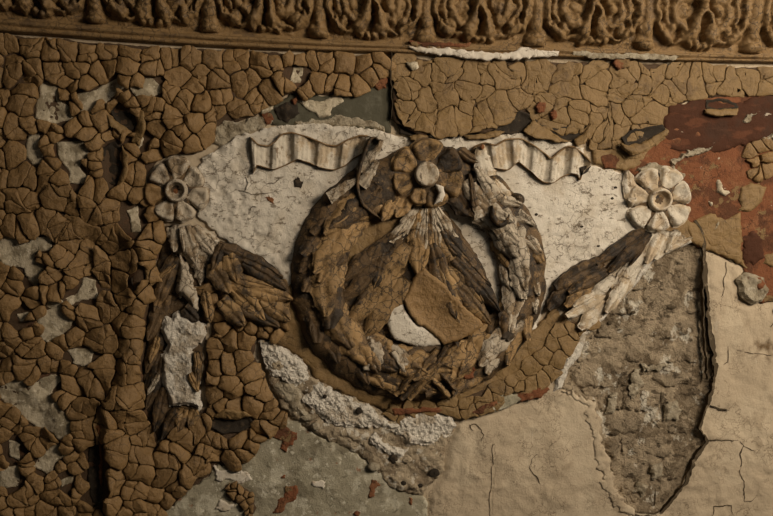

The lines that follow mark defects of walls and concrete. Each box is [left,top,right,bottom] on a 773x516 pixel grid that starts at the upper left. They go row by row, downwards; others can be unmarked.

peeling [35,75,163,185]
crack [0,33,396,516]
flaking render [157,338,458,516]
flaking render [197,76,592,300]
flaking render [387,304,441,371]
peeling [409,46,559,61]
crack [381,320,601,438]
flaking render [496,163,637,330]
crack [391,53,773,159]
flaking render [553,240,712,516]
crack [619,220,771,516]
crack [741,132,773,182]